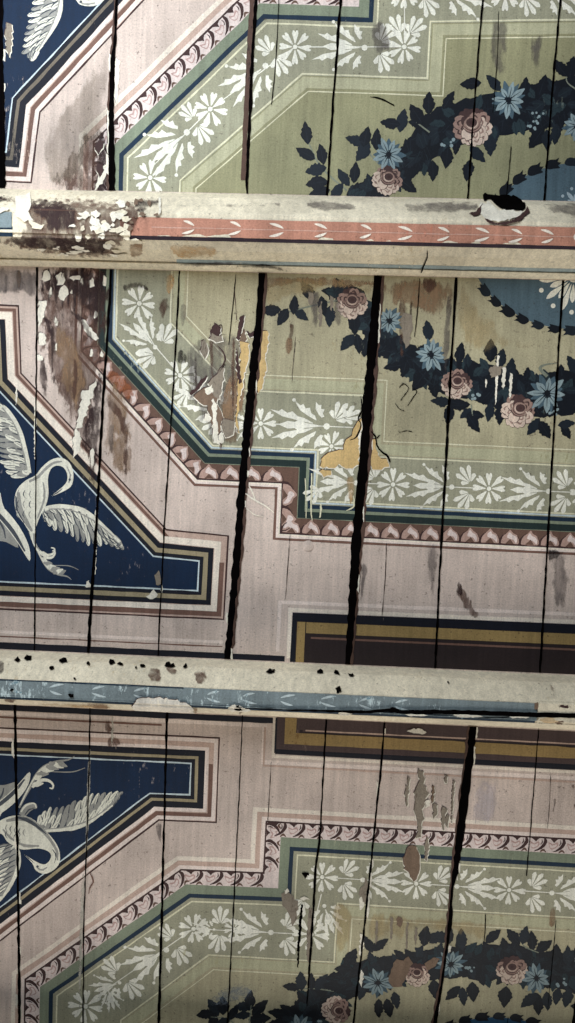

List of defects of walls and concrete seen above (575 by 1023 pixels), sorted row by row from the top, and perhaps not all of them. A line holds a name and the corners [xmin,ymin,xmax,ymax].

crack [0,0,8,188]
crack [106,0,118,191]
peeling [35,269,107,361]
peeling [72,381,97,465]
peeling [37,197,161,261]
peeling [189,315,270,445]
crack [214,273,267,659]
spalling [319,418,390,478]
crack [345,276,417,665]
crack [434,278,458,668]
peeling [469,193,530,225]
crack [226,707,575,1023]